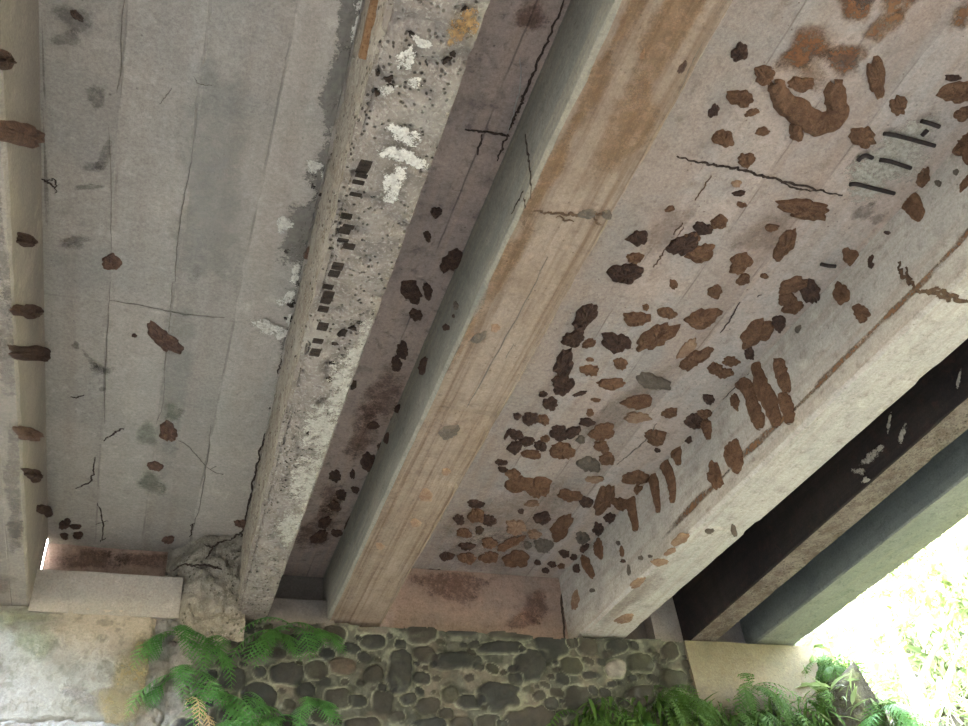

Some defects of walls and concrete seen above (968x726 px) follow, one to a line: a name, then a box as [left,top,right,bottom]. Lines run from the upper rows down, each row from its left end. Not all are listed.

peeling [249,0,363,363]
crack [465,0,612,226]
spalling [731,41,748,62]
crack [676,156,843,201]
spalling [708,55,968,222]
rust [776,0,915,75]
rust [951,2,968,28]
crack [72,133,224,542]
spalling [729,252,769,286]
crack [897,261,968,303]
crack [173,426,265,571]
spalling [438,276,871,610]